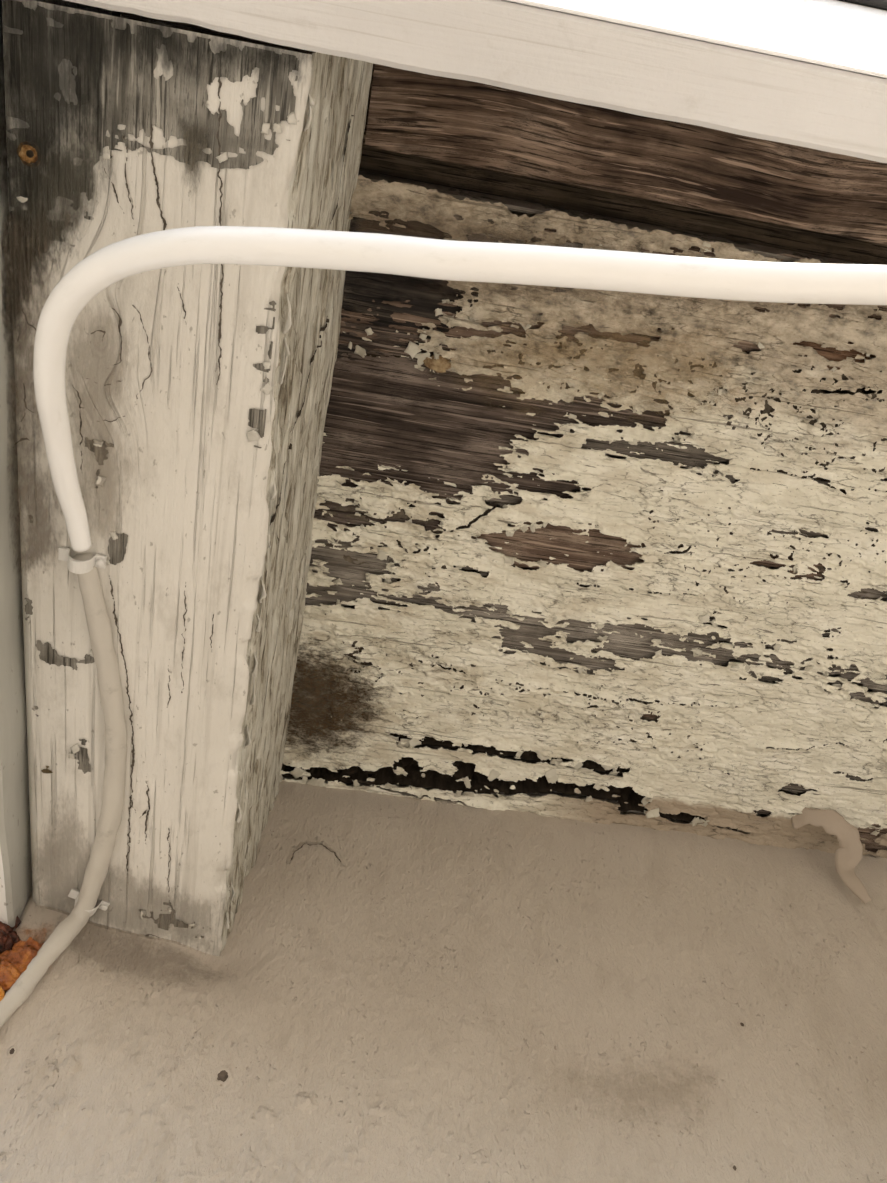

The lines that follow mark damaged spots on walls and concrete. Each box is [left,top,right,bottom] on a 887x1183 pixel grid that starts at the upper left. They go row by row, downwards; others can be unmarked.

peeling [2,0,299,315]
peeling [349,211,452,240]
peeling [466,219,605,249]
peeling [640,241,716,257]
water stain [0,0,300,568]
peeling [246,408,267,448]
peeling [305,271,887,709]
peeling [106,531,128,565]
peeling [35,640,95,670]
water stain [285,643,383,756]
spalling [281,731,737,831]
peeling [782,783,814,794]